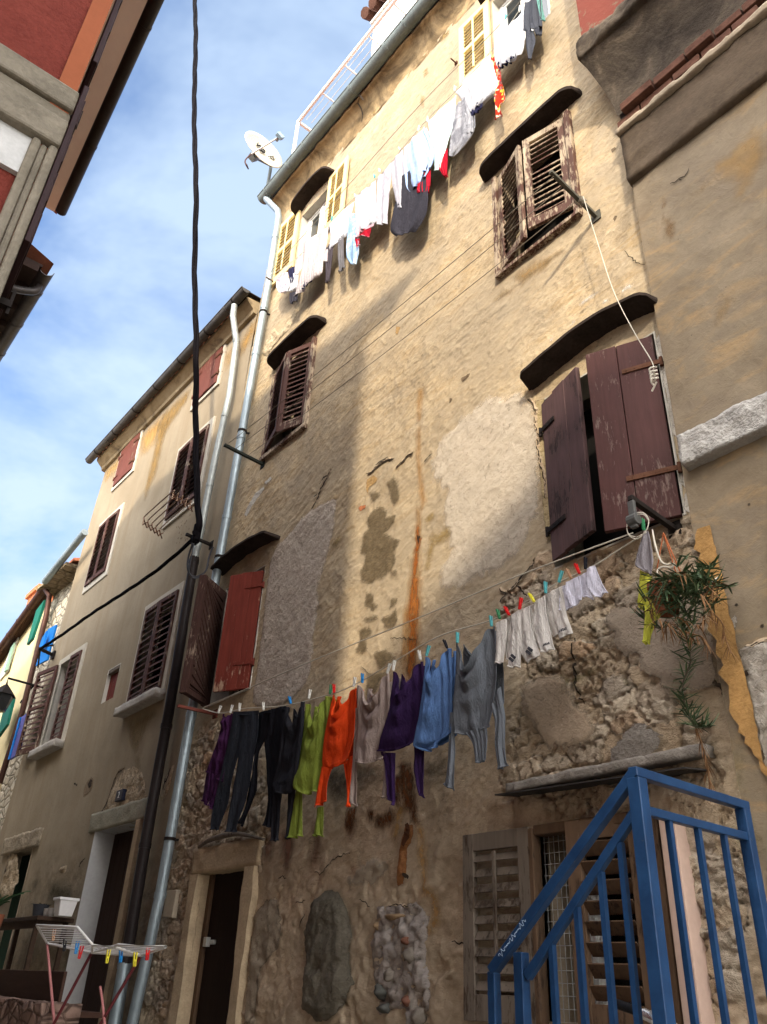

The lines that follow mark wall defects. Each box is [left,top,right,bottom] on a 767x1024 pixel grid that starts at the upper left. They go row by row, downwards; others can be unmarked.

crack [311,468,332,509]
leakage [356,478,399,694]
rust [404,521,421,676]
peeling [521,676,594,748]